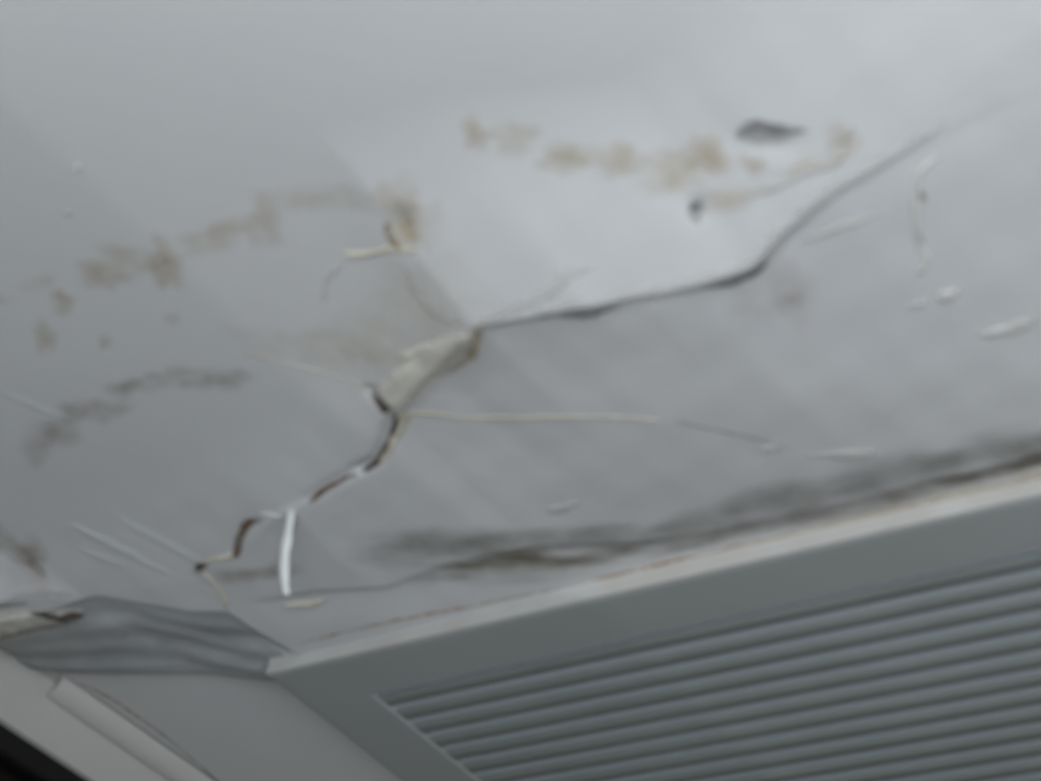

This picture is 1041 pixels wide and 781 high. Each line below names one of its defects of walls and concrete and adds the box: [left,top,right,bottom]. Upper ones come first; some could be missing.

crack [311,393,399,500]
peeling [0,511,324,681]